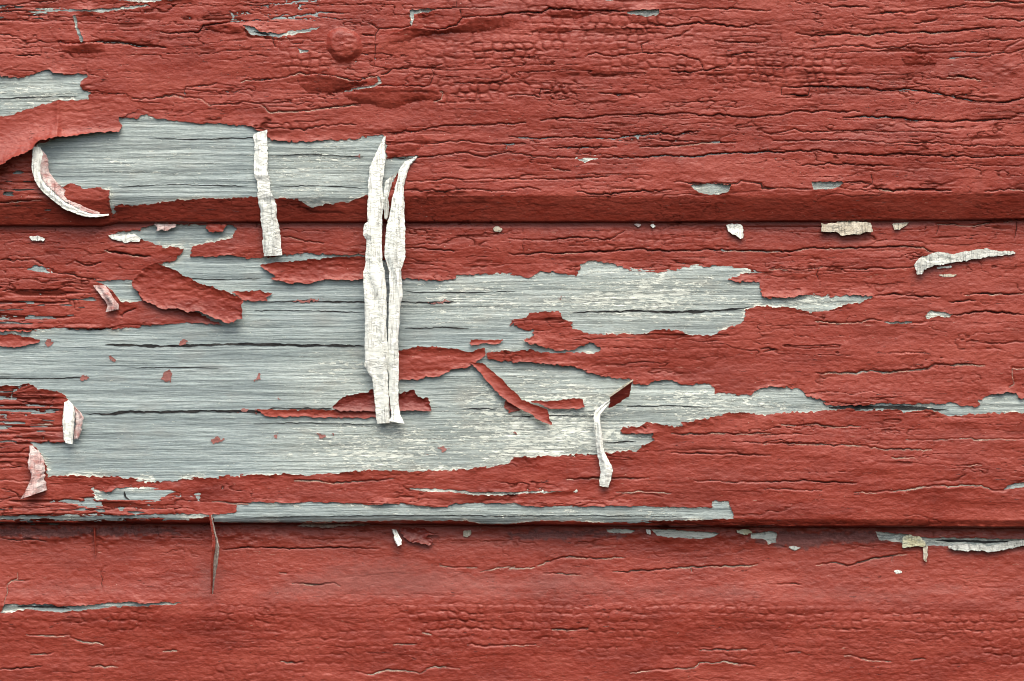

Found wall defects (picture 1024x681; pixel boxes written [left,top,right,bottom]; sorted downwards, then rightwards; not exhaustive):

crack [1,0,60,56]
crack [90,0,1024,195]
peeling [0,70,1024,594]
crack [815,317,880,325]
crack [825,352,977,375]
crack [671,424,1015,494]
crack [227,546,366,586]
crack [440,556,758,576]
crack [790,554,907,585]
crack [3,635,118,670]
crack [356,628,588,675]
crack [630,649,754,674]